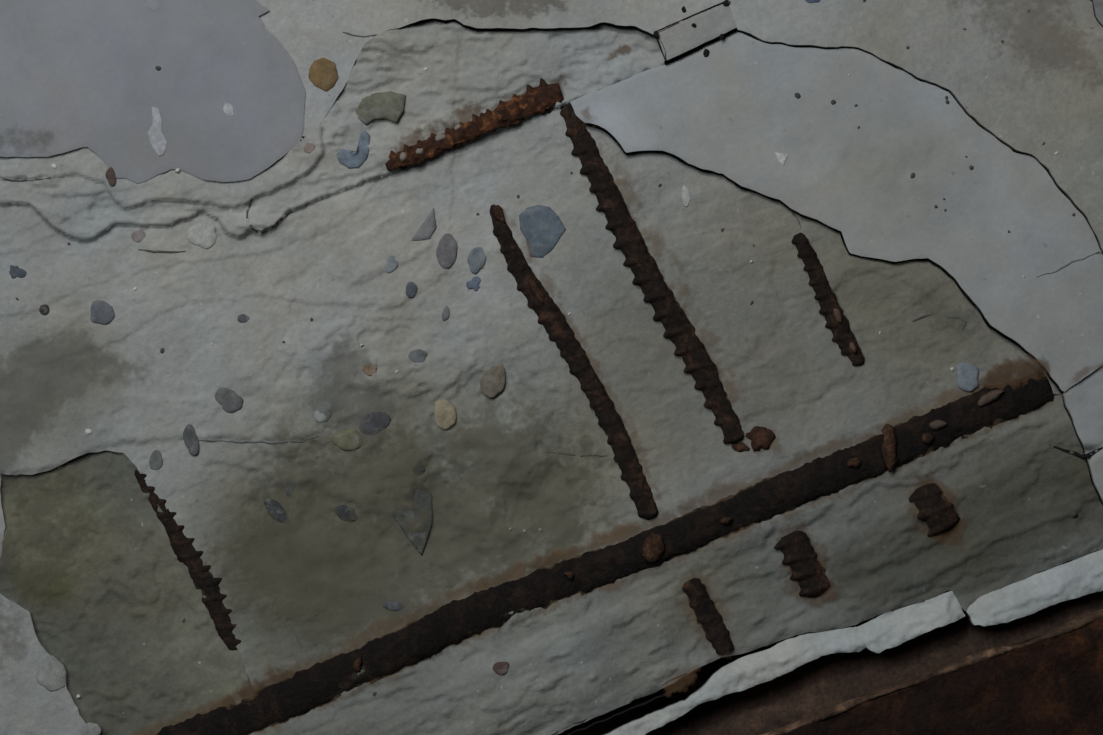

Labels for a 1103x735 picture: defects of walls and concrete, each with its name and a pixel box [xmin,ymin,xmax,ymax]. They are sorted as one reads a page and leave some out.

peeling [148,107,167,157]
water stain [446,0,563,16]
peeling [256,0,1103,253]
spalling [0,451,254,735]
spalling [250,365,1103,735]
rust [759,608,1103,735]